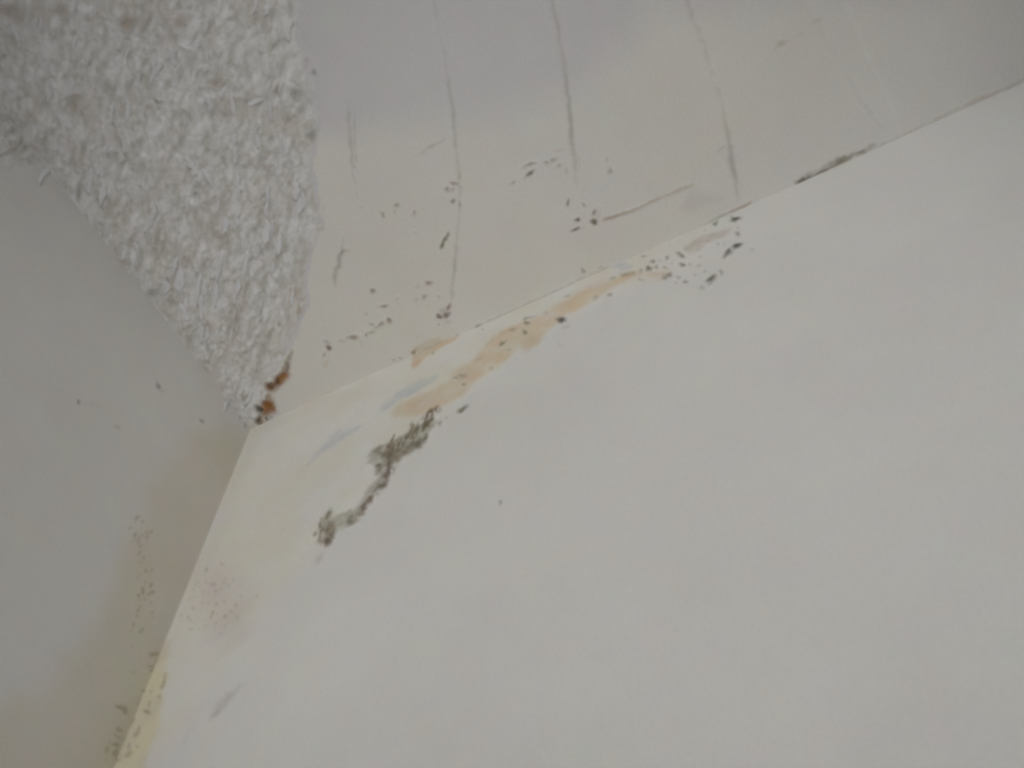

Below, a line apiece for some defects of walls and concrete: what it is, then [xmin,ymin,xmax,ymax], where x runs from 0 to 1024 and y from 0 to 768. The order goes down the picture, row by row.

crack [547,0,582,189]
leakage [274,0,1024,415]
rust [255,349,297,426]
leakage [310,403,473,567]